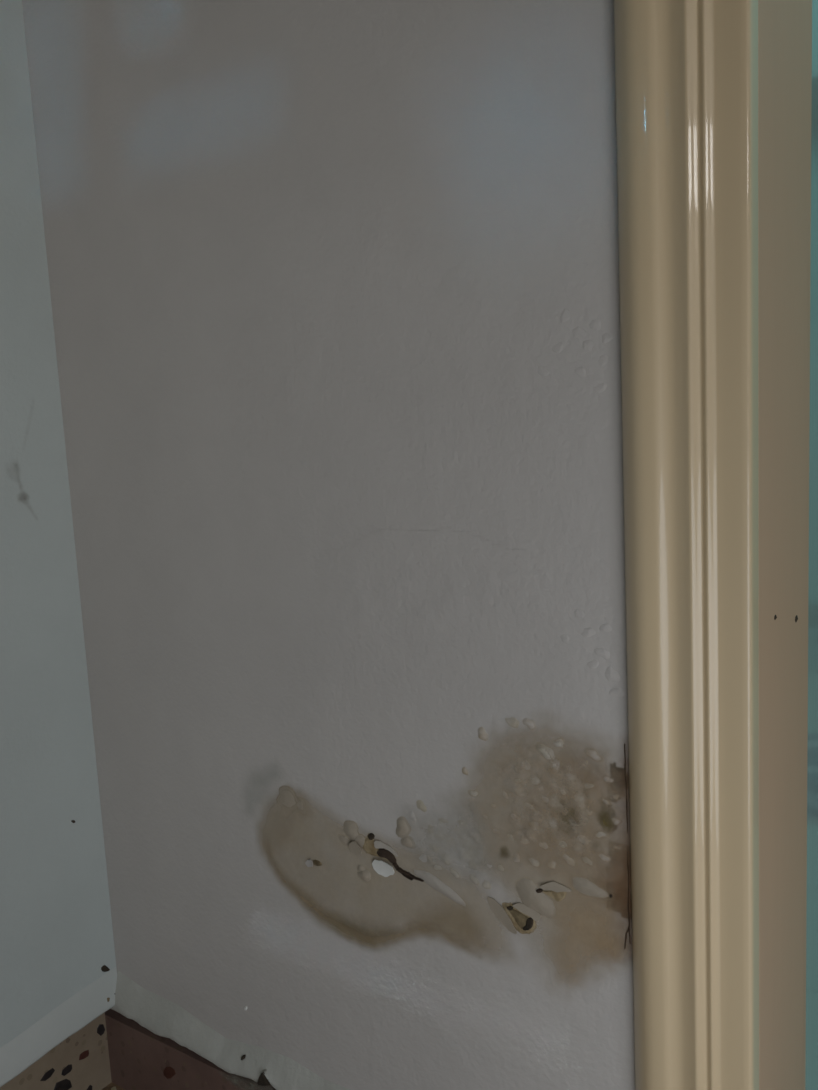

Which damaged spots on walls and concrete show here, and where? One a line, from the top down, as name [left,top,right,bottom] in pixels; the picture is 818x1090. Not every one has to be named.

peeling [349,833,399,877]
leakage [264,801,499,945]
spalling [488,897,541,934]
leakage [472,742,613,970]